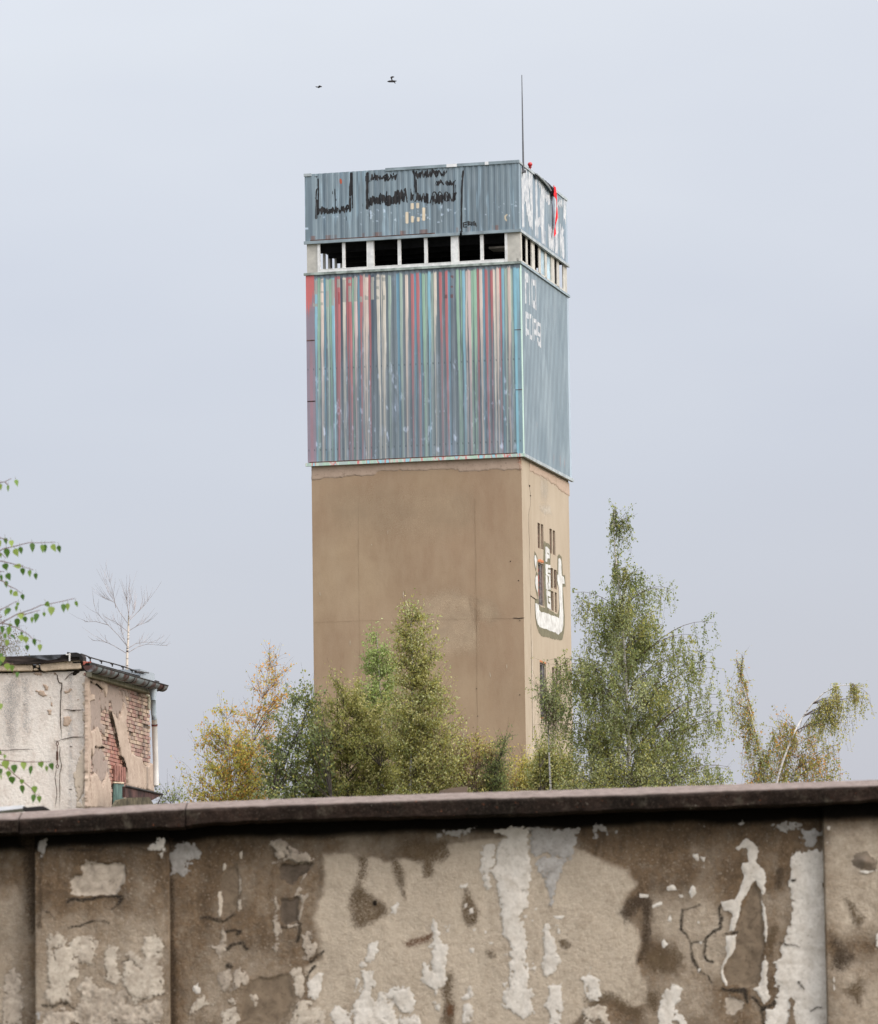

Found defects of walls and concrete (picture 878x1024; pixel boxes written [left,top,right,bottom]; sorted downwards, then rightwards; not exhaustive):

crack [35,669,128,804]
peeling [63,670,154,808]
spalling [69,859,126,896]
peeling [36,931,165,1024]
peeling [148,837,202,877]
peeling [189,838,421,1024]
water stain [346,854,389,930]
peeling [473,823,618,1024]
water stain [617,891,686,977]
peeling [657,983,687,1024]
crack [679,904,776,1024]
peeling [721,821,835,1024]